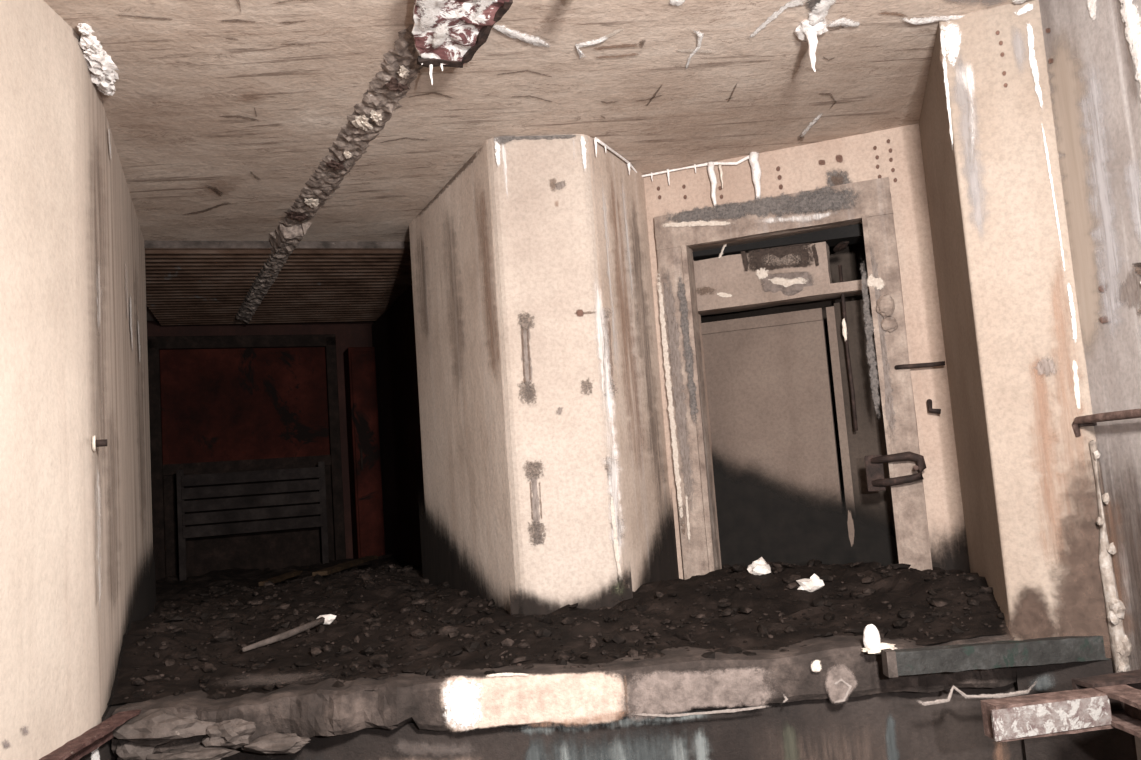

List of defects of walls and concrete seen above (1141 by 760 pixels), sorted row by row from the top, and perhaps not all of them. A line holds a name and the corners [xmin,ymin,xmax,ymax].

crack [121,13,172,21]
crack [222,0,255,40]
leakage [750,0,860,41]
leakage [1120,0,1141,98]
peeling [397,65,410,79]
peeling [351,110,382,131]
crack [185,187,231,215]
peeling [304,198,319,208]
leakage [664,155,857,227]
rust [1036,367,1116,658]
spalling [112,660,1053,760]
leakage [522,722,707,760]